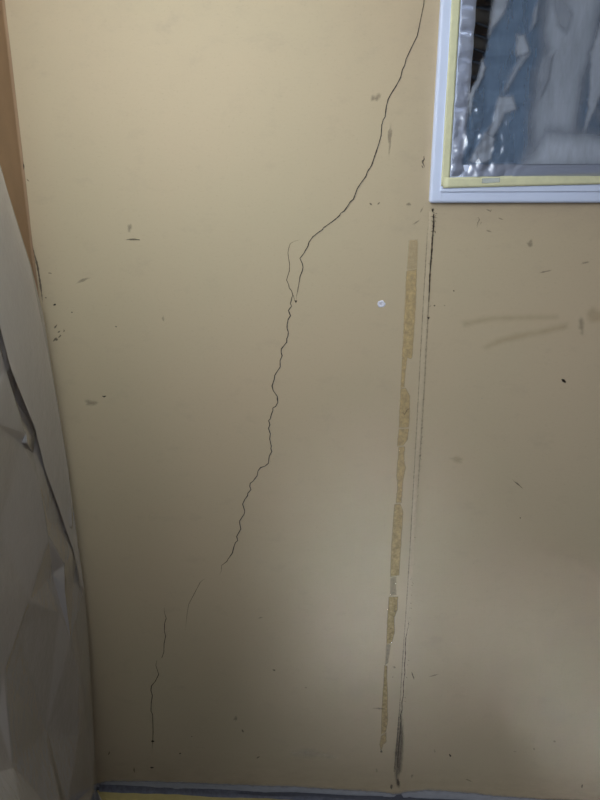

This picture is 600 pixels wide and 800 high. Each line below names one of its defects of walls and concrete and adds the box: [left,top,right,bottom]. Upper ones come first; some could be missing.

crack [221,3,424,569]
crack [427,214,436,318]
crack [397,608,412,759]